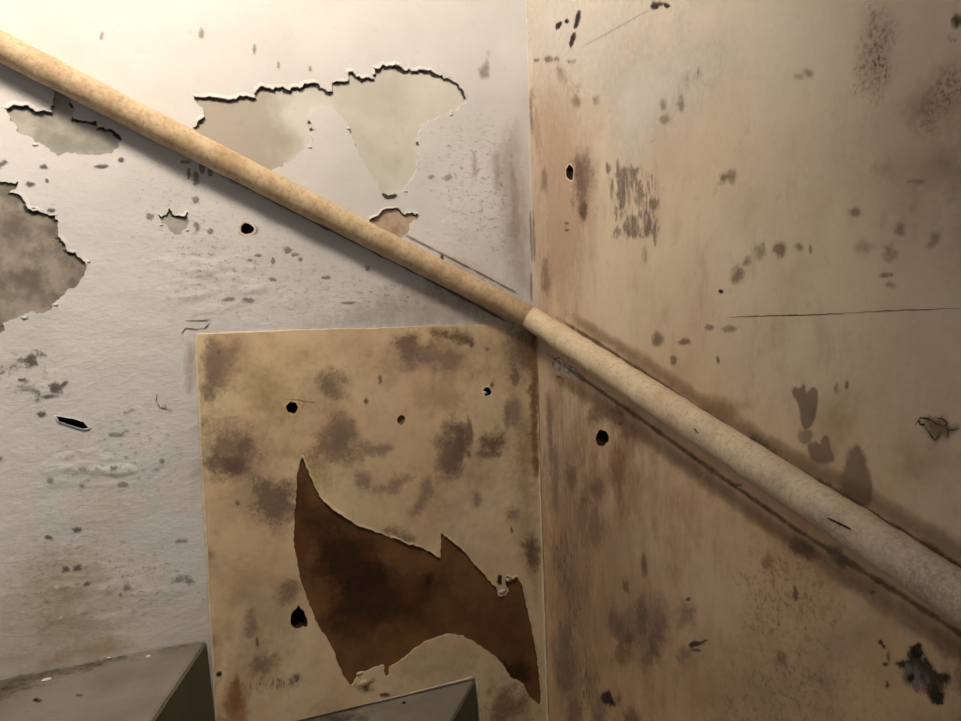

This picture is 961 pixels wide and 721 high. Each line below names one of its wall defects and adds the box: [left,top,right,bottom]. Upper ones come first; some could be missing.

peeling [2,90,124,168]
peeling [191,60,468,238]
peeling [0,164,91,333]
peeling [147,160,230,263]
crack [738,308,955,317]
peeling [1,352,92,430]
damp [437,402,517,474]
damp [507,333,575,511]
damp [792,386,817,428]
damp [808,436,833,463]
damp [843,447,871,505]
damp [896,643,949,705]